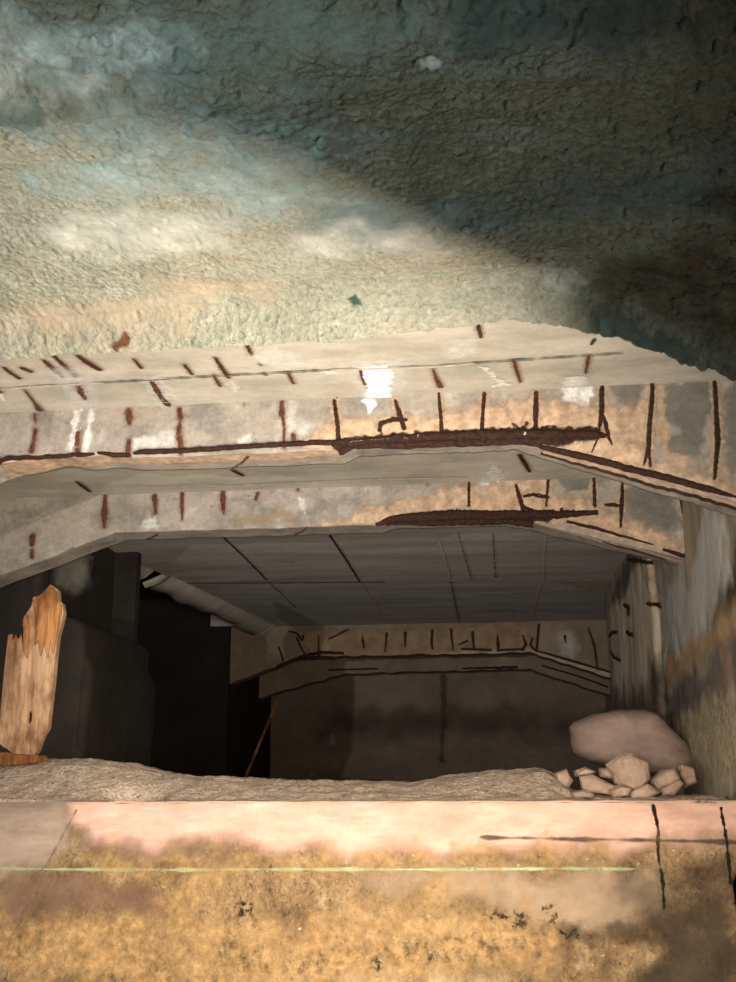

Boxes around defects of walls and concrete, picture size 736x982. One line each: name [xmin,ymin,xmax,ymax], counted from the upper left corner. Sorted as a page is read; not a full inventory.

damp [593,247,736,366]
rust [42,355,88,400]
damp [68,410,94,453]
rust [150,381,183,455]
rust [279,401,296,448]
damp [358,365,394,413]
rust [333,421,600,450]
spalling [0,380,736,608]
damp [550,555,685,706]
damp [0,635,736,982]
crack [651,804,666,909]
crack [720,807,733,885]